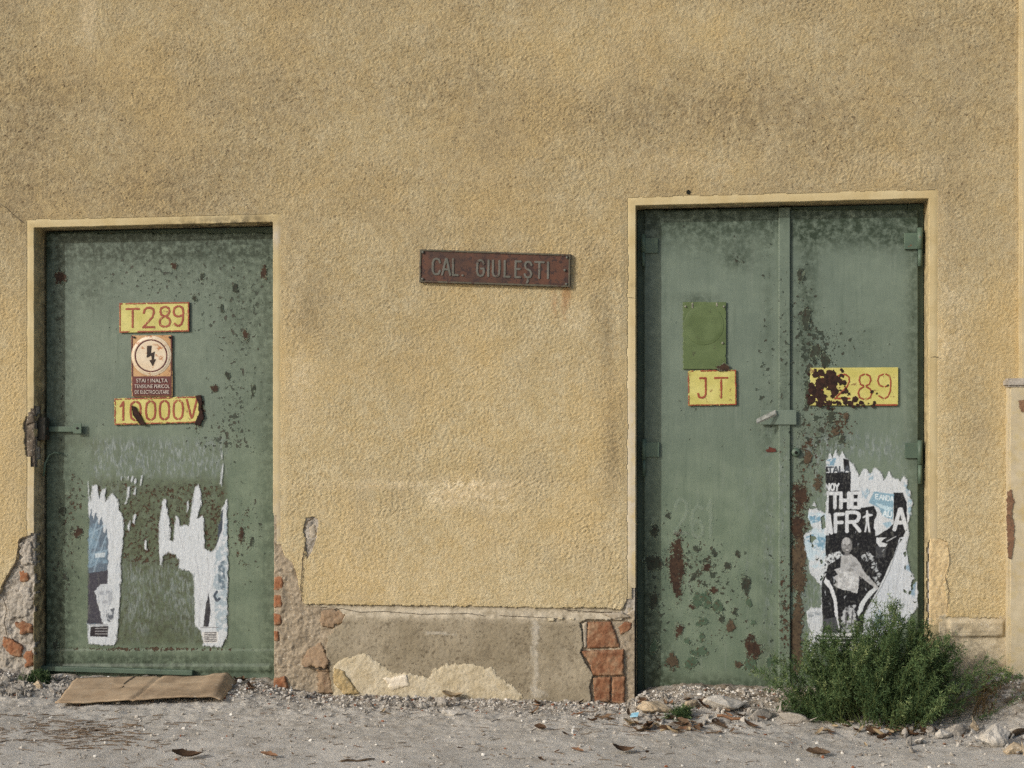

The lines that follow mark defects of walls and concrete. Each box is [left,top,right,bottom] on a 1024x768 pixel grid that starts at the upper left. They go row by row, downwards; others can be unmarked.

spalling [0,533,36,675]
spalling [273,515,523,701]
spalling [580,588,635,704]
corrosion [664,621,684,671]
corrosion [665,529,694,610]
corrosion [735,632,765,668]
corrosion [790,450,823,687]
peeling [1006,490,1015,559]